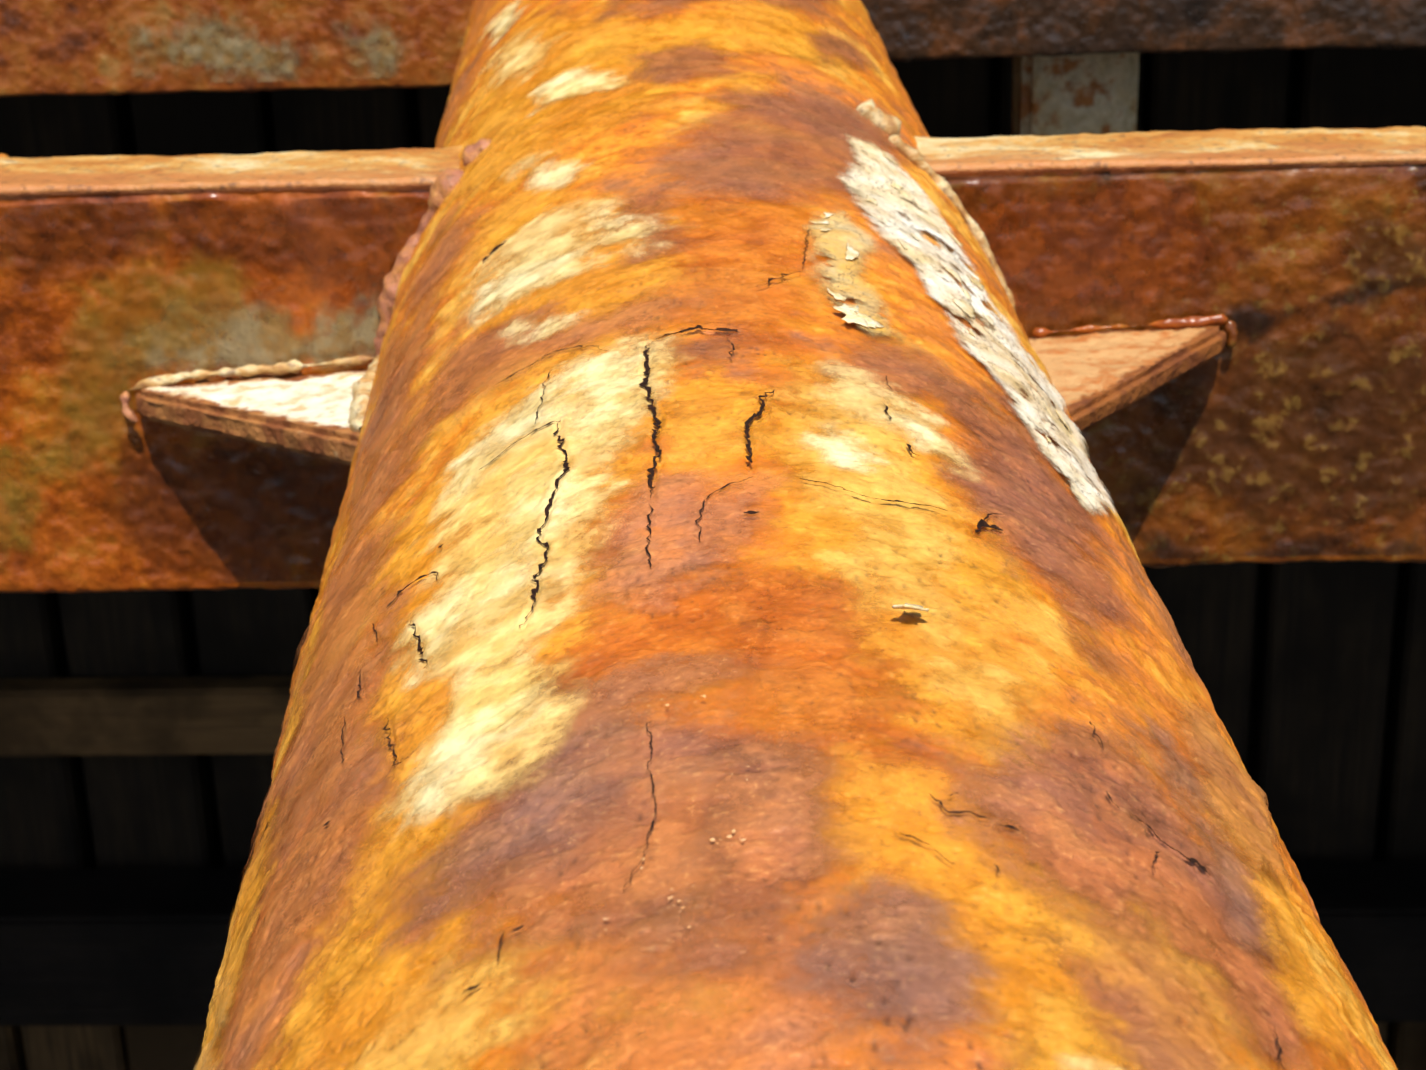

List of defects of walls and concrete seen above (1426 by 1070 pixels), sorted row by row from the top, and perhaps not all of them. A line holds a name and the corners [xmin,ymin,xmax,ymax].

rust [639,47,736,83]
rust [0,197,415,289]
rust [114,440,349,582]
crack [479,345,607,627]
crack [639,325,738,567]
crack [695,389,775,539]
rust [437,92,1130,668]
peeling [808,136,1115,512]
rust [959,178,1254,330]
crack [372,571,438,666]
crack [340,675,401,766]
rust [210,470,1310,1070]